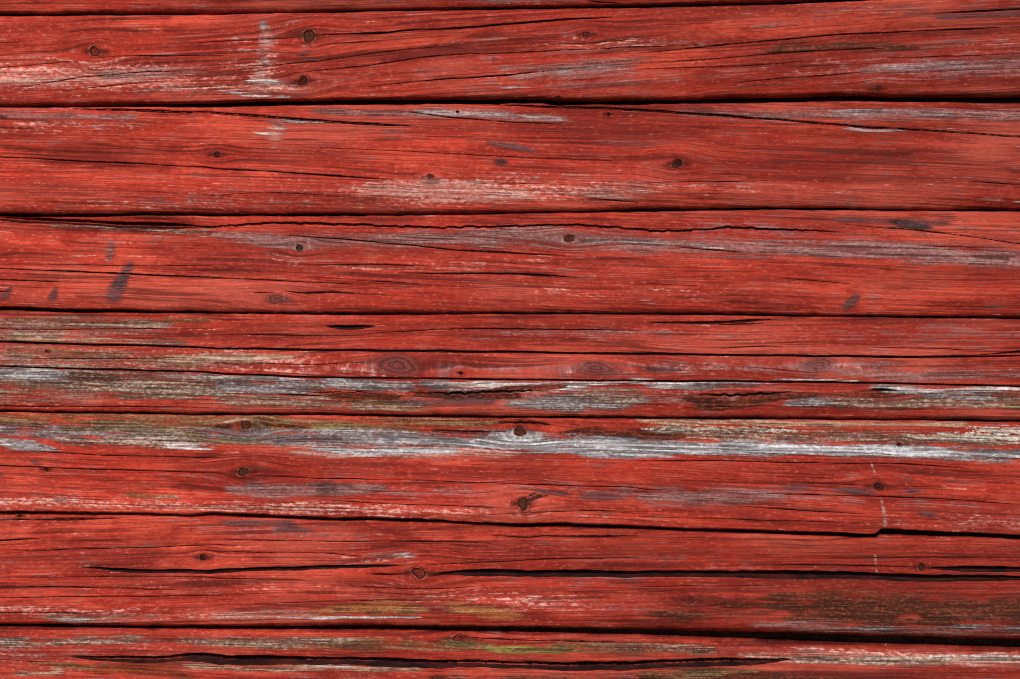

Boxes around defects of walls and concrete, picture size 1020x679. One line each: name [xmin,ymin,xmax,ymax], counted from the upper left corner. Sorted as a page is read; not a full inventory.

crack [1,1,1020,137]
crack [0,156,392,195]
crack [0,216,1020,293]
peeling [0,319,182,344]
peeling [0,354,1020,462]
crack [0,451,213,473]
crack [649,460,1010,522]
crack [0,475,1020,613]
crack [71,636,789,671]